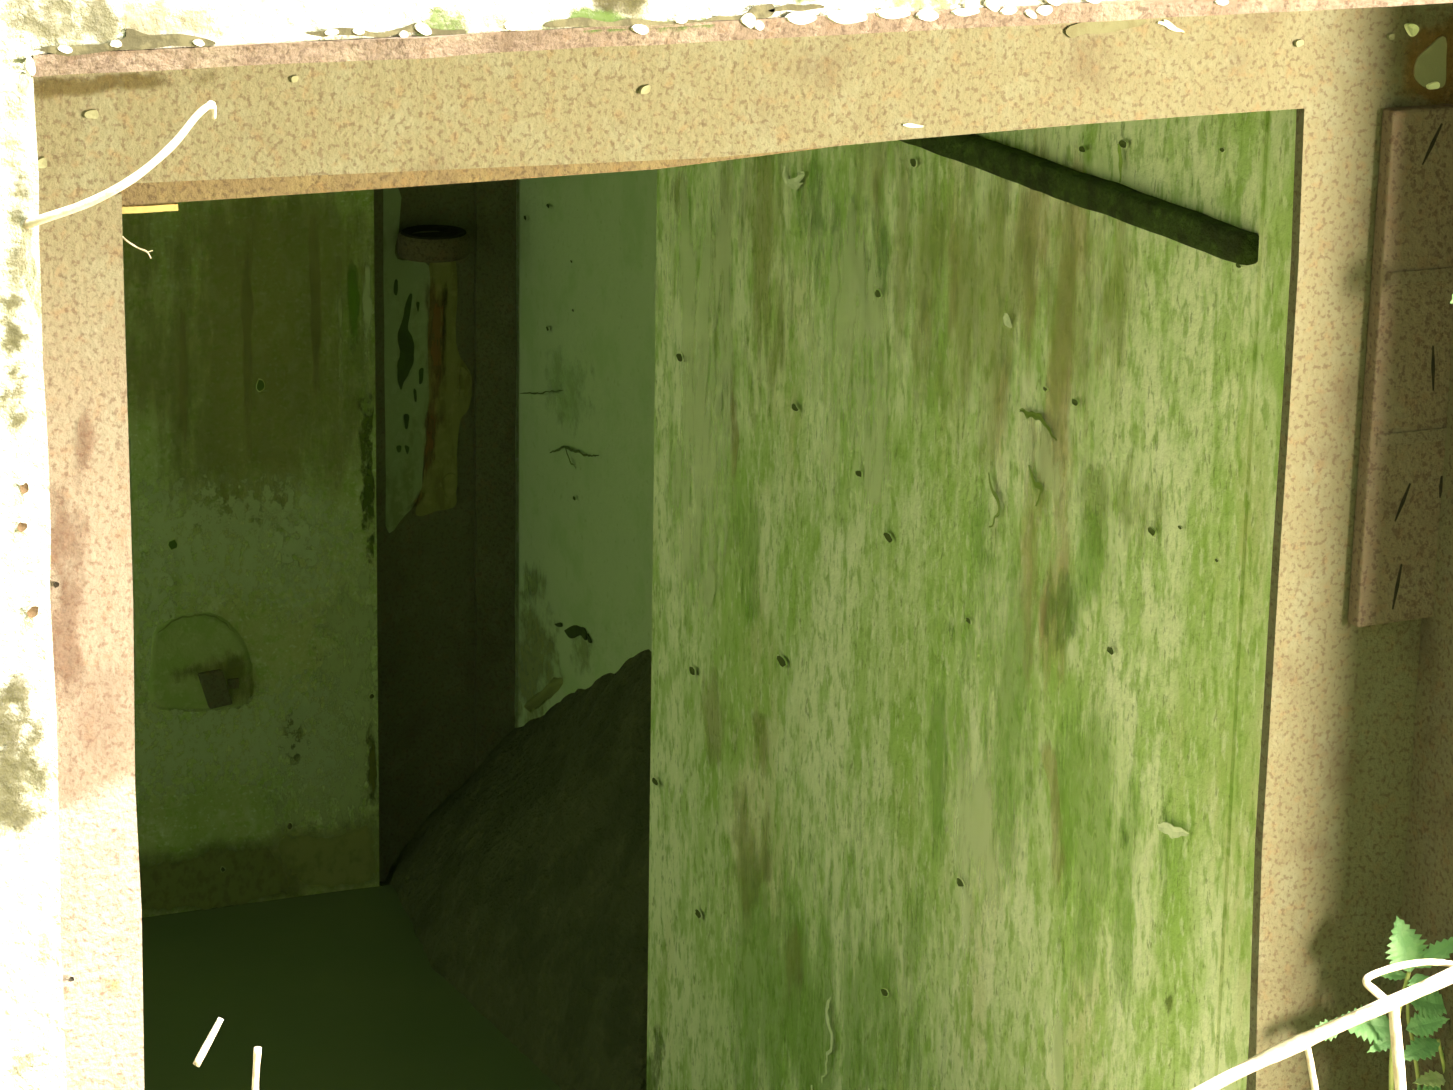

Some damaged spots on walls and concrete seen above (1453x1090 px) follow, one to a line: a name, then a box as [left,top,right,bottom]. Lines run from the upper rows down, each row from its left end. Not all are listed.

peeling [383,188,472,533]
corrosion [424,286,447,473]
damp [123,194,379,917]